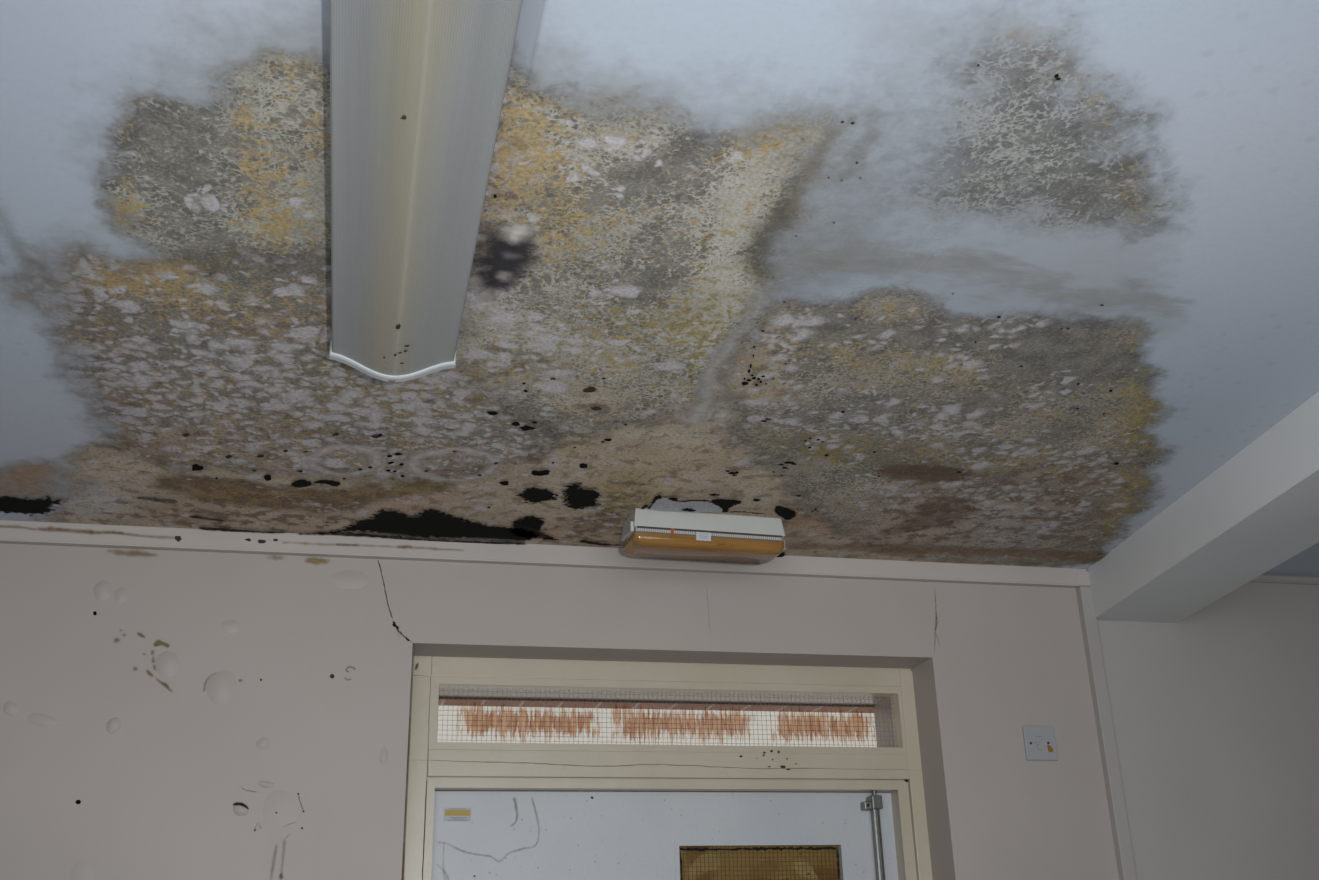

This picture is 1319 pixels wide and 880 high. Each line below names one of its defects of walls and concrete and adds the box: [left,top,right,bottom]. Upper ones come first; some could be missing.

water stain [0,47,1171,567]
crack [378,560,413,643]
crack [414,675,835,880]